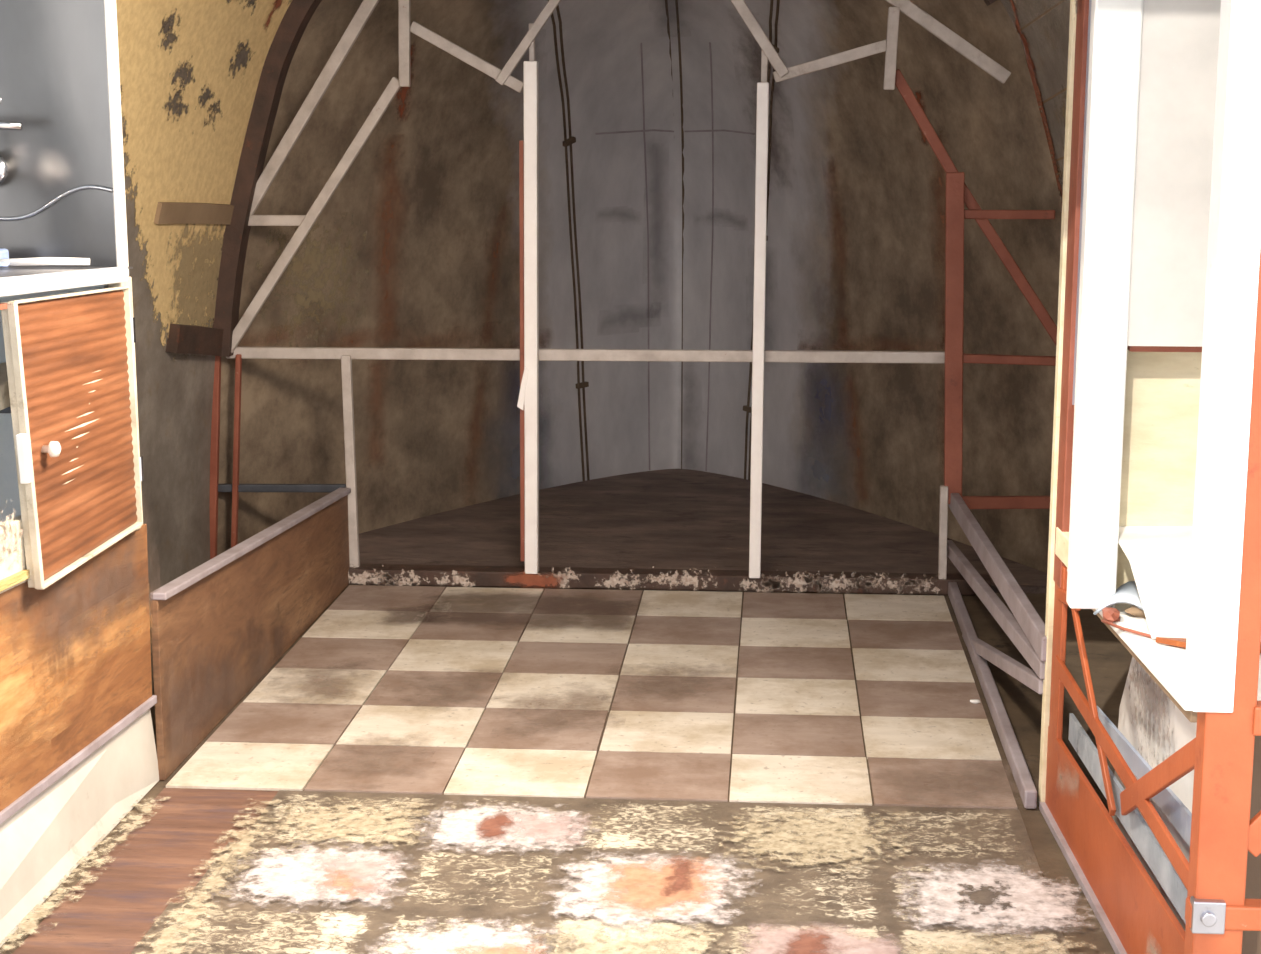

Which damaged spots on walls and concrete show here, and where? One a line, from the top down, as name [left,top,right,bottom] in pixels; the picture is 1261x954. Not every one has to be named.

corrosion [1009,0,1062,196]